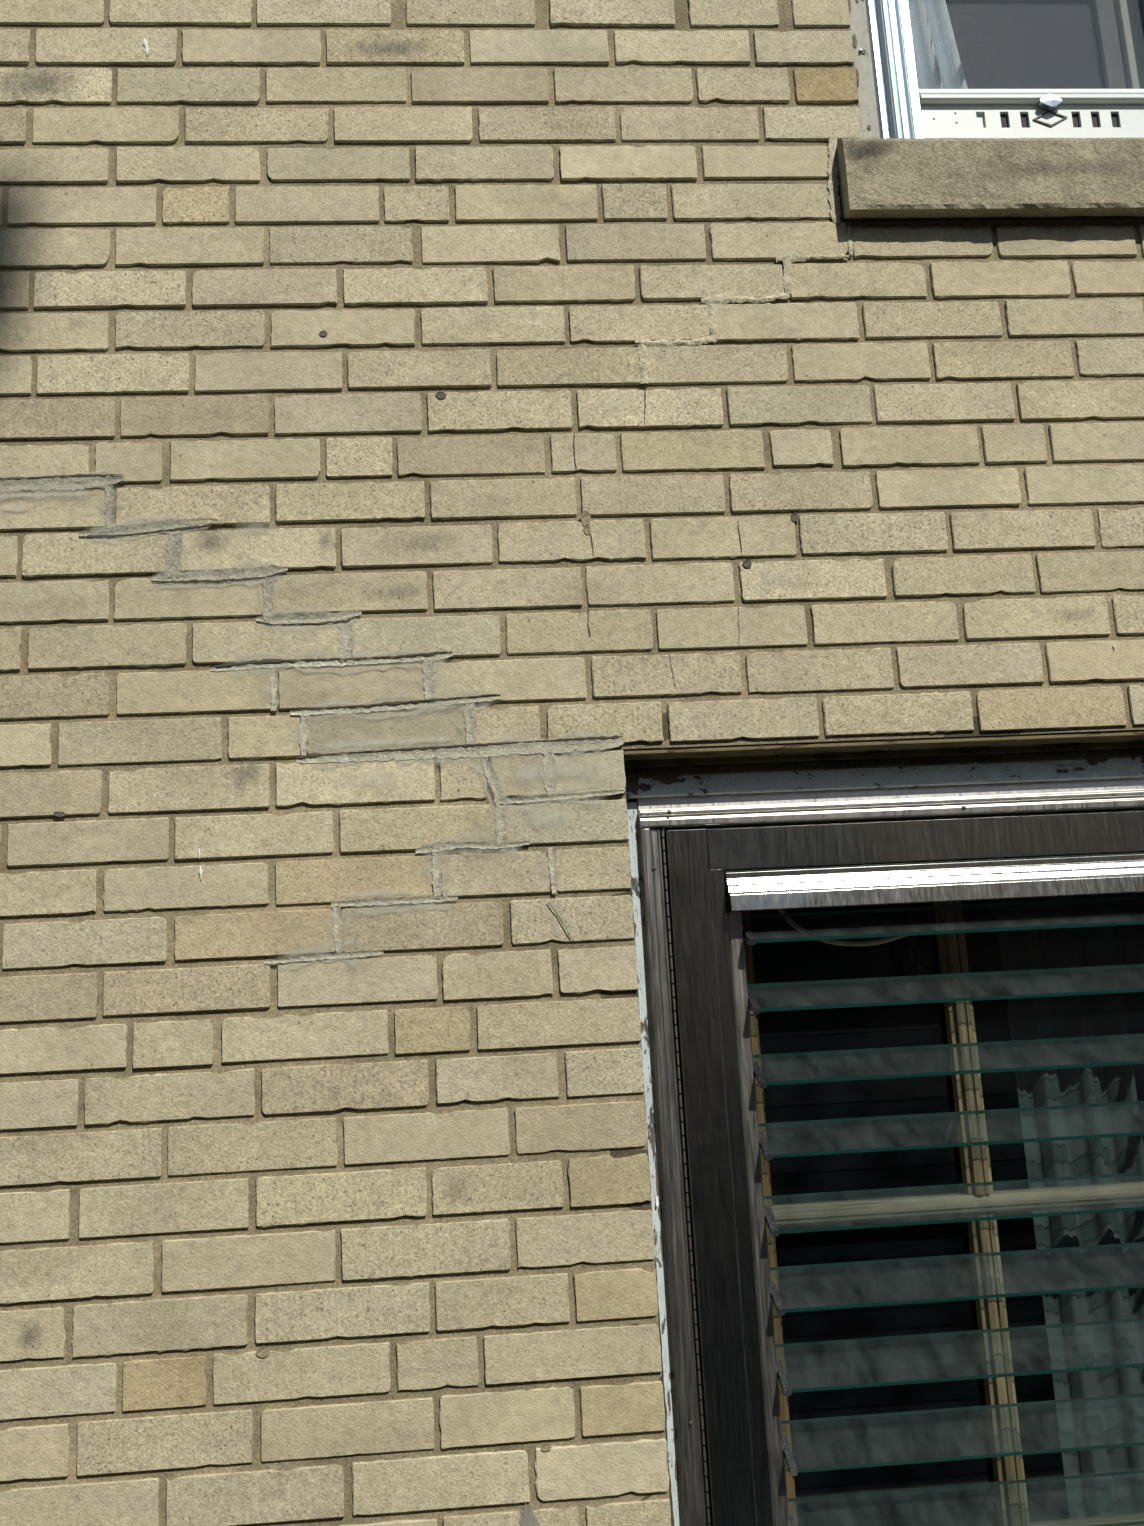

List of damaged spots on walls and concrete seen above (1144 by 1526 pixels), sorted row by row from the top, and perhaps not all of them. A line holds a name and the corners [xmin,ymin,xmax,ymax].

crack [0,470,624,969]